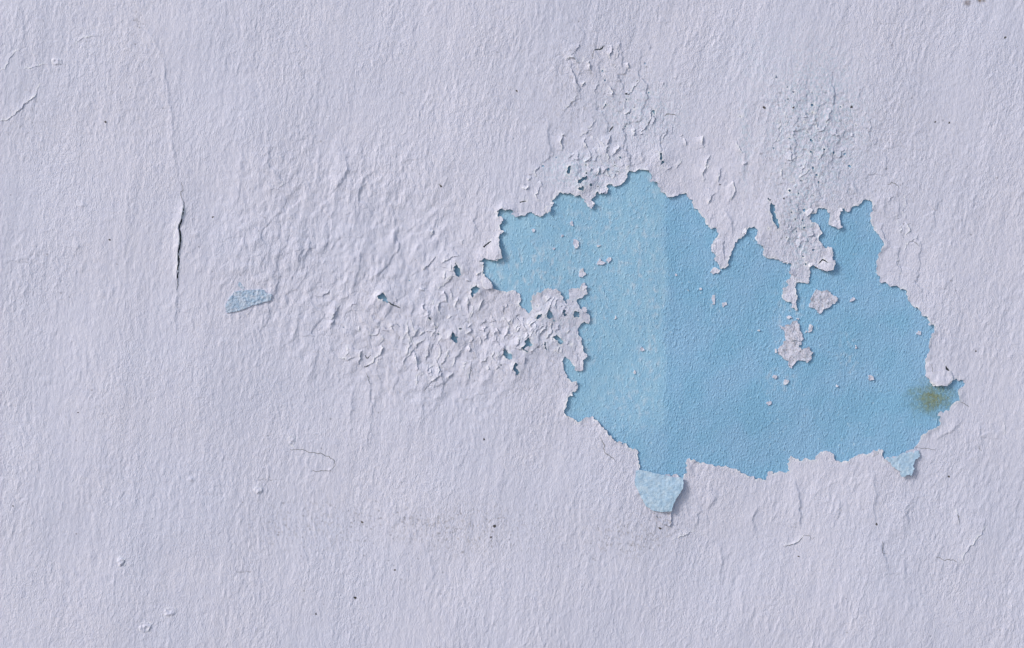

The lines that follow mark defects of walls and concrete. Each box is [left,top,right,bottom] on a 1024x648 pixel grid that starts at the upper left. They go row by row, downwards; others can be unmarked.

crack [173,183,185,290]
peeling [225,282,272,313]
peeling [314,38,965,539]